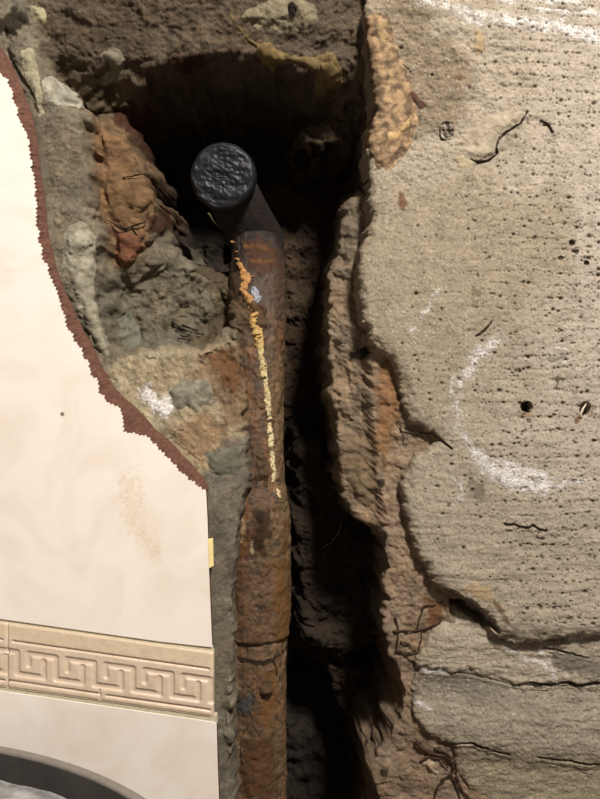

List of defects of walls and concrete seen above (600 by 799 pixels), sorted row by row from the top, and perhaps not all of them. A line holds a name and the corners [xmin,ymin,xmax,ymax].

peeling [230,11,343,100]
spalling [364,12,422,170]
peeling [66,231,95,249]
peeling [250,286,262,303]
efflorescence [449,338,585,495]
rust [240,510,272,558]
crack [505,524,548,538]
spalling [376,638,404,704]
crack [448,677,597,691]
rust [240,738,279,799]